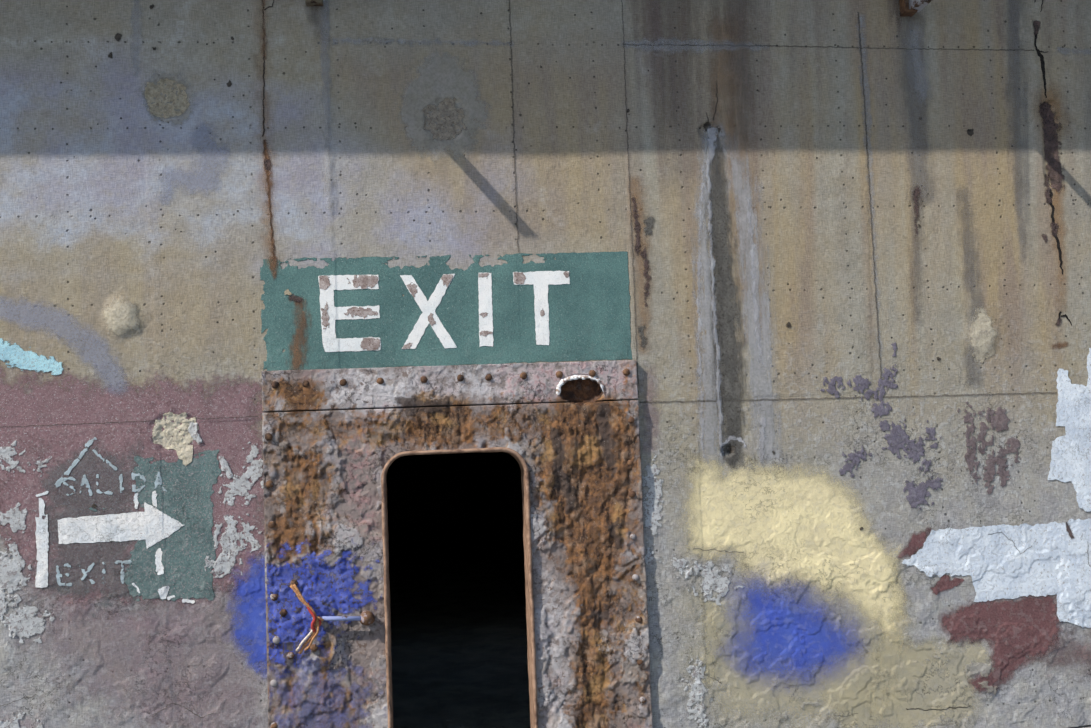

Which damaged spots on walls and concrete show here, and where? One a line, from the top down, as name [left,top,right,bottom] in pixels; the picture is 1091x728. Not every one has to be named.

rust [264,142,277,278]
rust [284,289,306,369]
leakage [696,122,780,469]
crack [621,0,1057,404]
crack [1049,190,1063,274]
peeling [0,441,52,477]
peeling [0,502,62,644]
spalling [152,412,203,466]
peeling [201,441,264,578]
peeling [820,342,943,510]
peeling [956,402,1021,495]
peeling [0,712,43,728]